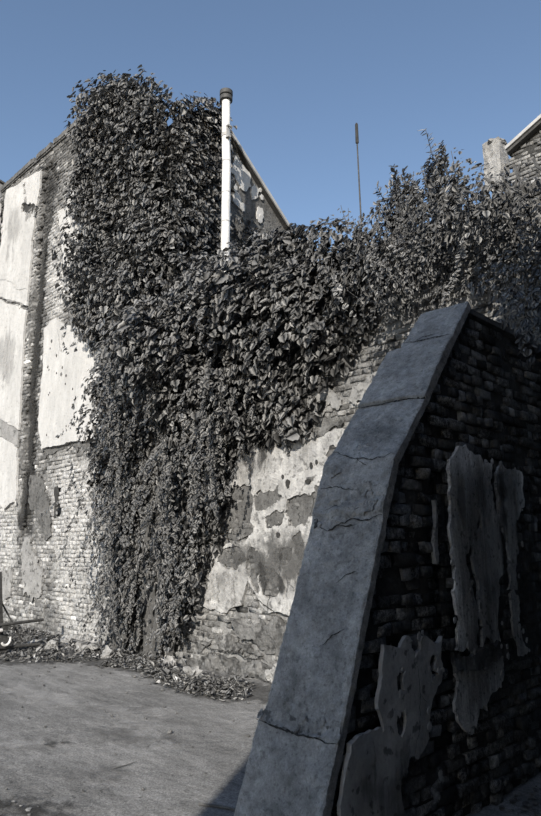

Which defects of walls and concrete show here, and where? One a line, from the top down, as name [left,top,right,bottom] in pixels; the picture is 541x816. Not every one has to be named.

flaking render [231,156,264,223]
flaking render [58,188,94,269]
flaking render [0,170,43,509]
flaking render [38,318,109,458]
crack [337,452,392,465]
flaking render [28,475,59,541]
flaking render [187,377,371,616]
crack [309,486,382,531]
flaking render [0,536,44,603]
flaking render [182,627,264,656]
flaking render [257,445,530,816]
crack [253,717,336,744]